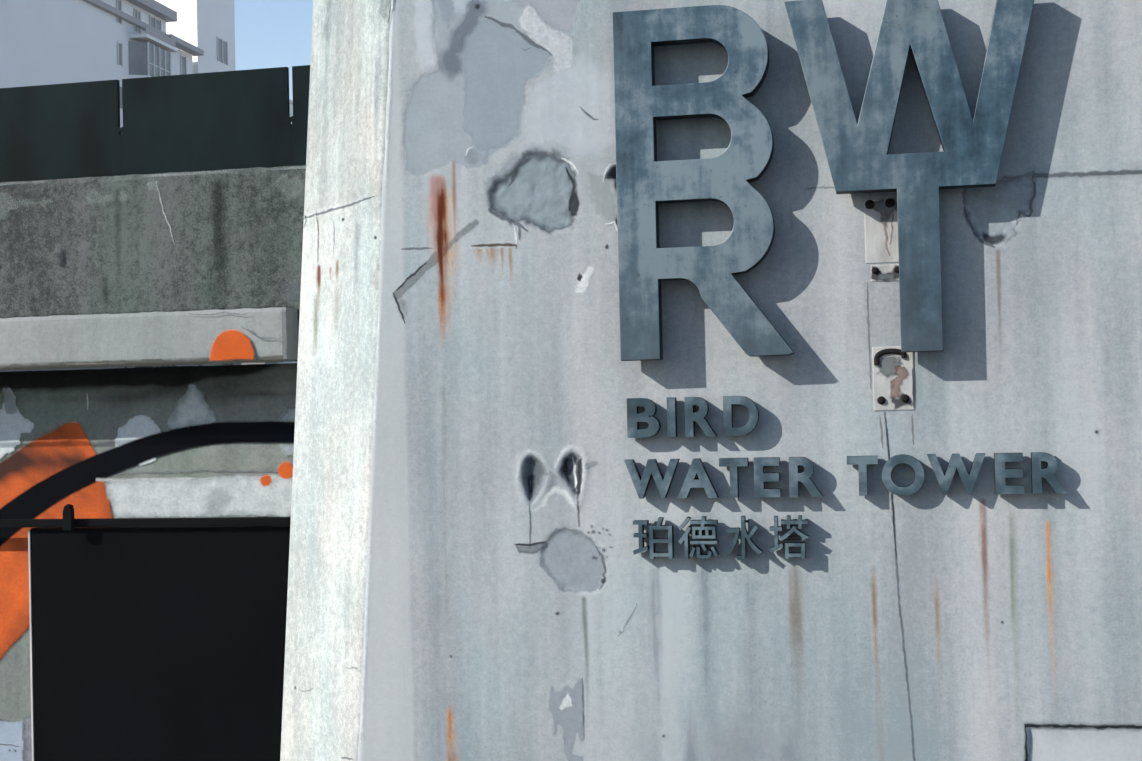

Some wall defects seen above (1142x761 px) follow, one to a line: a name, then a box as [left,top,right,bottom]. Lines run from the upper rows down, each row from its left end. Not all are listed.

peeling [403,0,578,174]
crack [303,196,375,228]
spalling [393,220,478,323]
rust [436,168,455,306]
spalling [488,151,579,244]
peeling [577,267,594,293]
spalling [963,171,1036,248]
spalling [515,453,612,592]
peeling [549,679,584,761]